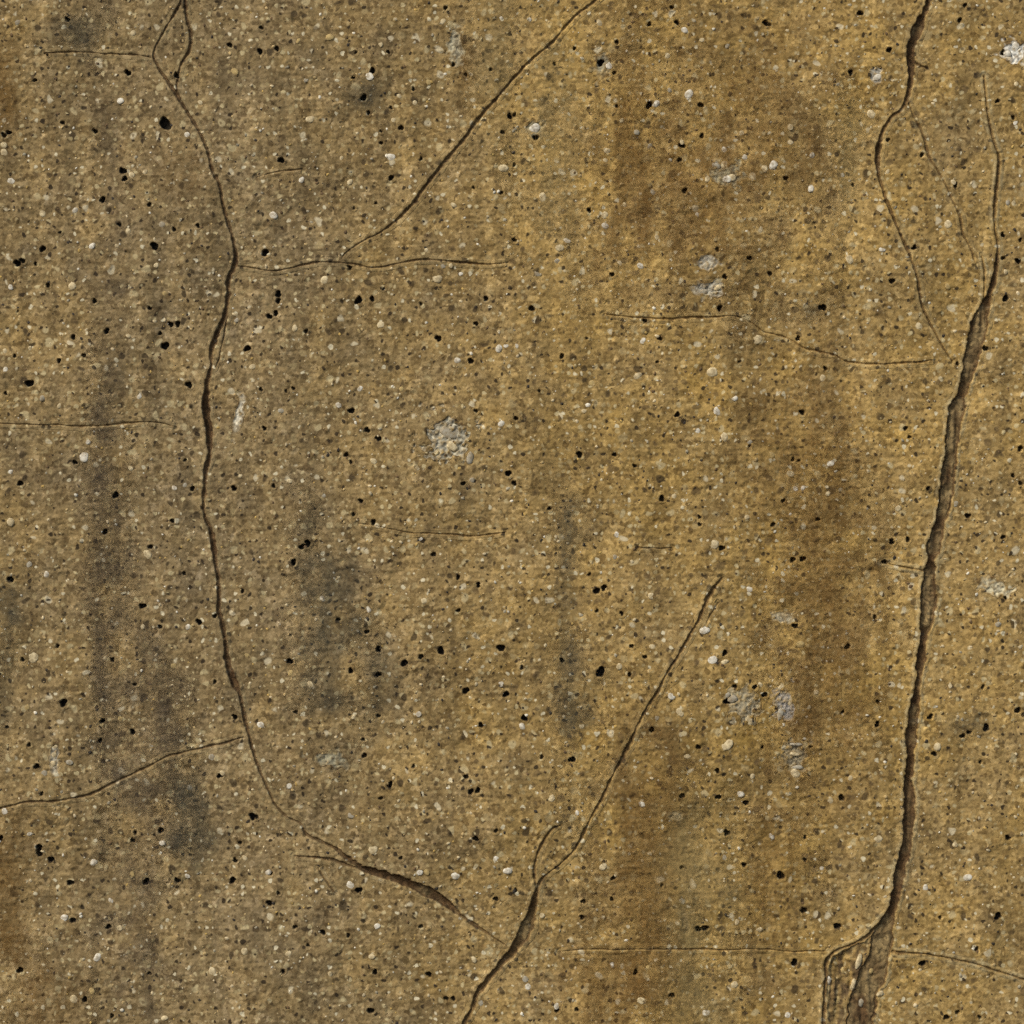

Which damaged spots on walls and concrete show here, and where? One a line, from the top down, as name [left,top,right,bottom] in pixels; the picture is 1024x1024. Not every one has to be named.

crack [0,0,724,1024]
crack [560,0,1024,1024]